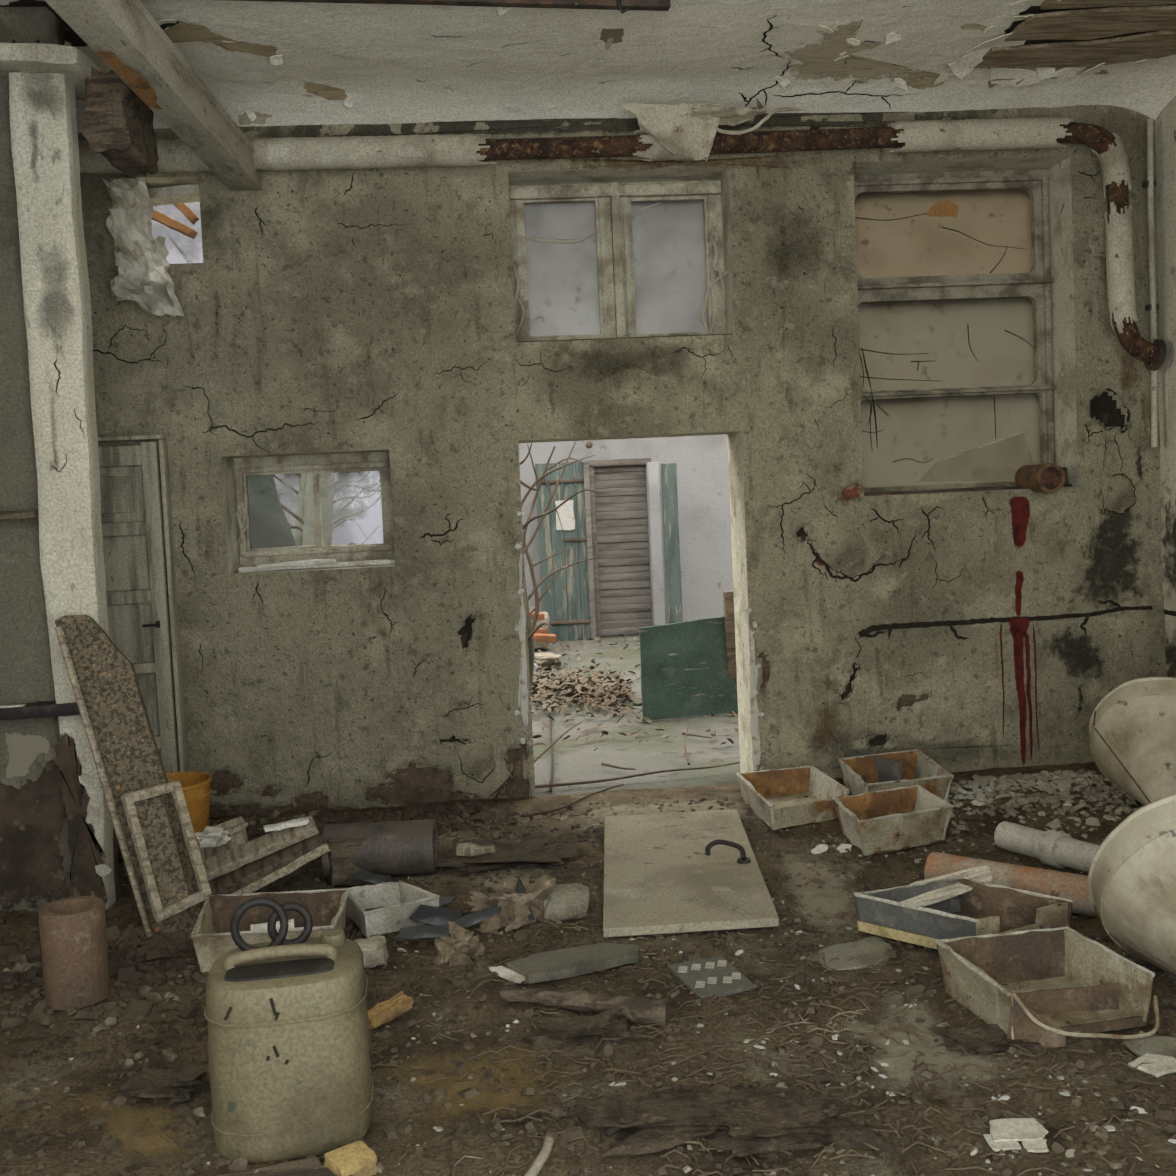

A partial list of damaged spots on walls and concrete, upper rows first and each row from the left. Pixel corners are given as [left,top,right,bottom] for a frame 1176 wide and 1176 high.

peeling [774,0,1176,91]
crack [93,325,401,454]
spalling [1090,387,1132,433]
crack [766,474,968,589]
damp [1162,502,1176,596]
crack [854,600,1176,658]
spalling [0,732,112,911]